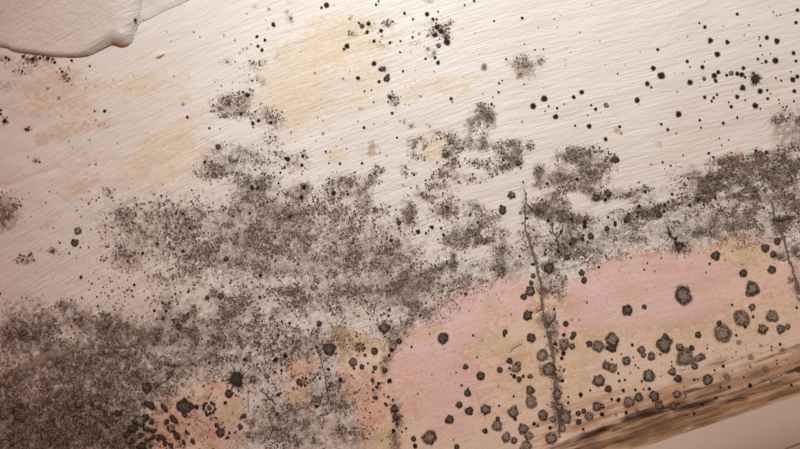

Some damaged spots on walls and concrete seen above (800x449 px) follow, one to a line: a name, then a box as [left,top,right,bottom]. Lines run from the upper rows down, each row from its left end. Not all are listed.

leakage [209,85,292,144]
leakage [364,61,412,127]
leakage [505,48,547,85]
leakage [530,90,584,119]
leakage [686,59,771,119]
leakage [0,99,800,449]
crack [524,189,561,438]